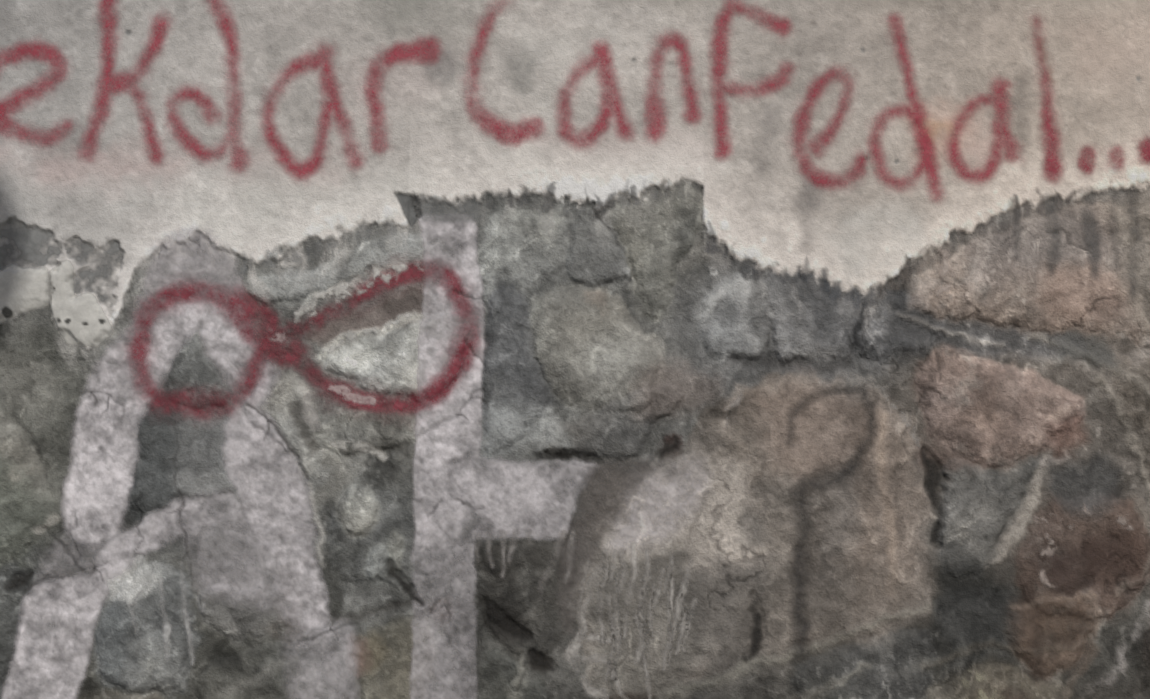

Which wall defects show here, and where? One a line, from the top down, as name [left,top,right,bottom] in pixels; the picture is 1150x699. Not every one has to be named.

spalling [417,198,478,221]
peeling [0,218,123,347]
peeling [329,386,376,405]
damp [562,465,696,699]